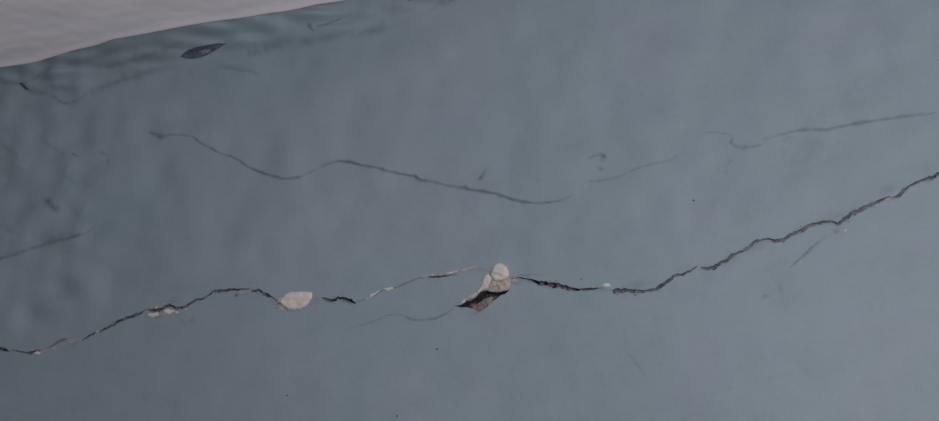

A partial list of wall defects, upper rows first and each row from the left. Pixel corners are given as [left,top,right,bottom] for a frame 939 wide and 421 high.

crack [512,171,939,295]
crack [0,287,287,355]
spalling [276,291,312,310]
crack [319,266,477,305]
spalling [454,263,517,312]